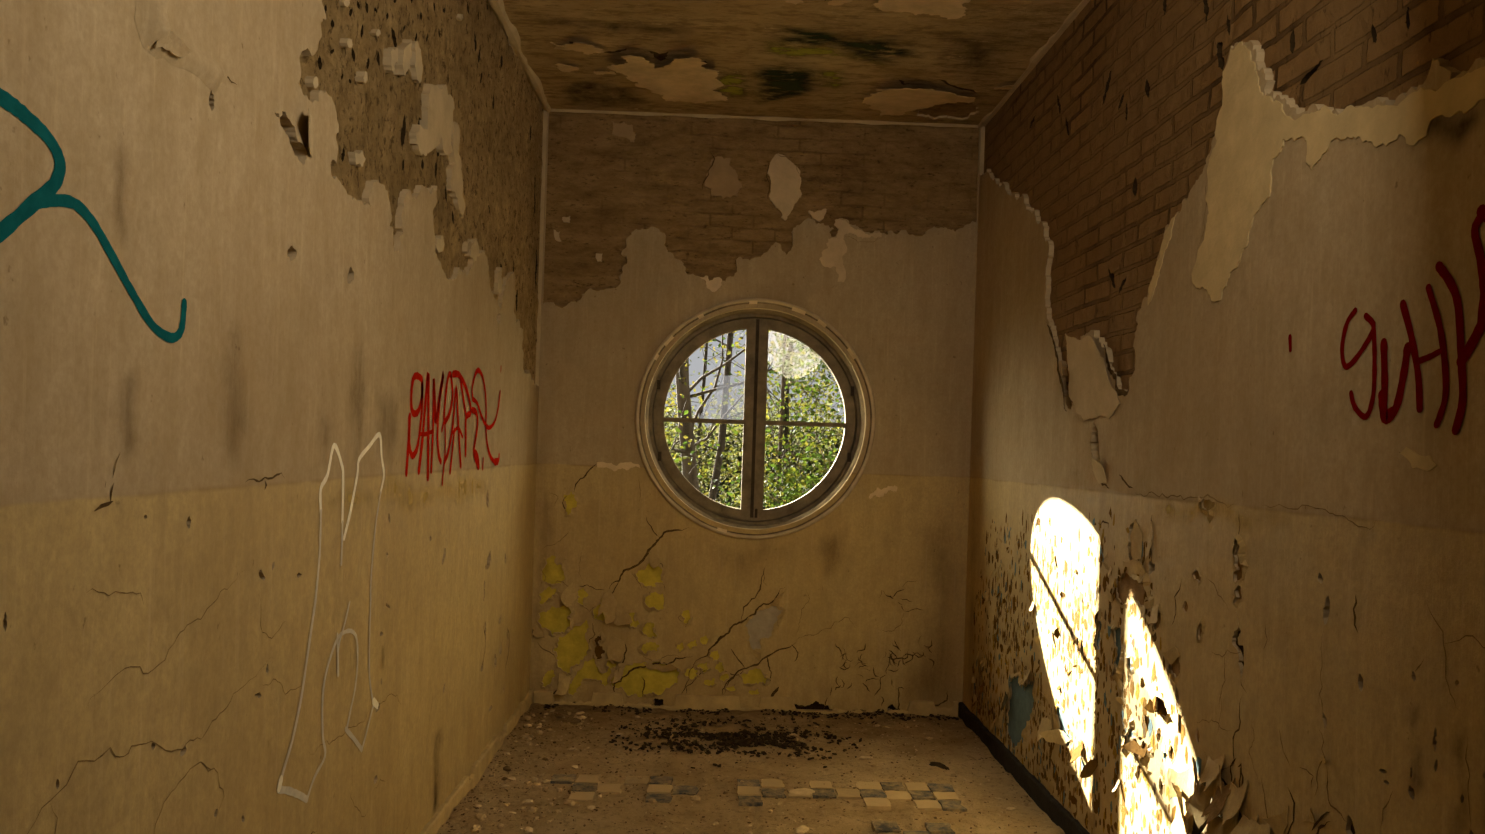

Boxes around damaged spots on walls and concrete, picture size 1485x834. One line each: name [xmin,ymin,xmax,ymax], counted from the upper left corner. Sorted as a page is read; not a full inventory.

spalling [298,0,1485,421]
crack [95,452,121,511]
crack [247,473,284,489]
crack [562,463,597,509]
crack [609,517,689,594]
crack [27,574,301,834]
peeling [532,551,771,699]
crack [695,568,850,697]
peeling [971,508,1347,834]